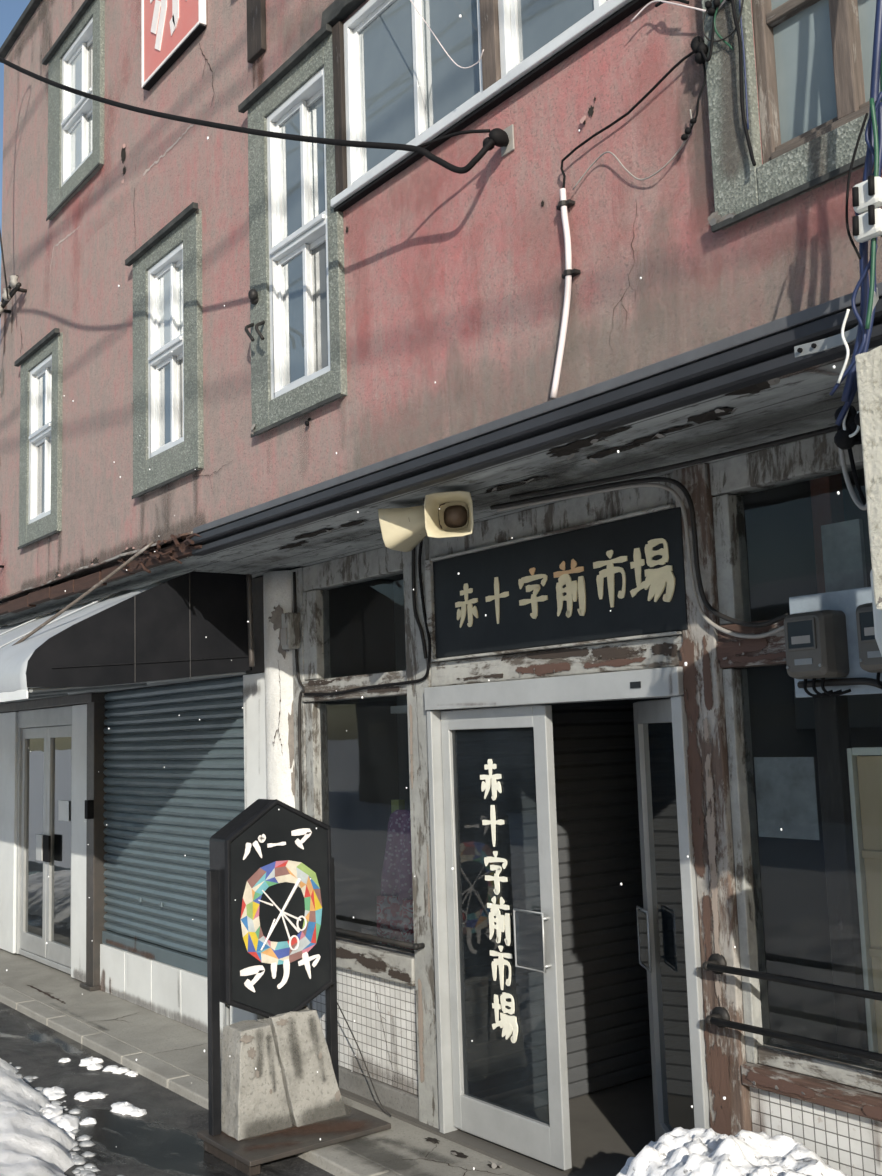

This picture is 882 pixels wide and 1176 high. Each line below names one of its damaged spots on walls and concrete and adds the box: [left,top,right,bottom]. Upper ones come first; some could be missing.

crack [609,201,637,355]
peeling [546,378,780,463]
peeling [268,605,289,659]
peeling [457,635,786,961]
peeling [703,974,733,1136]